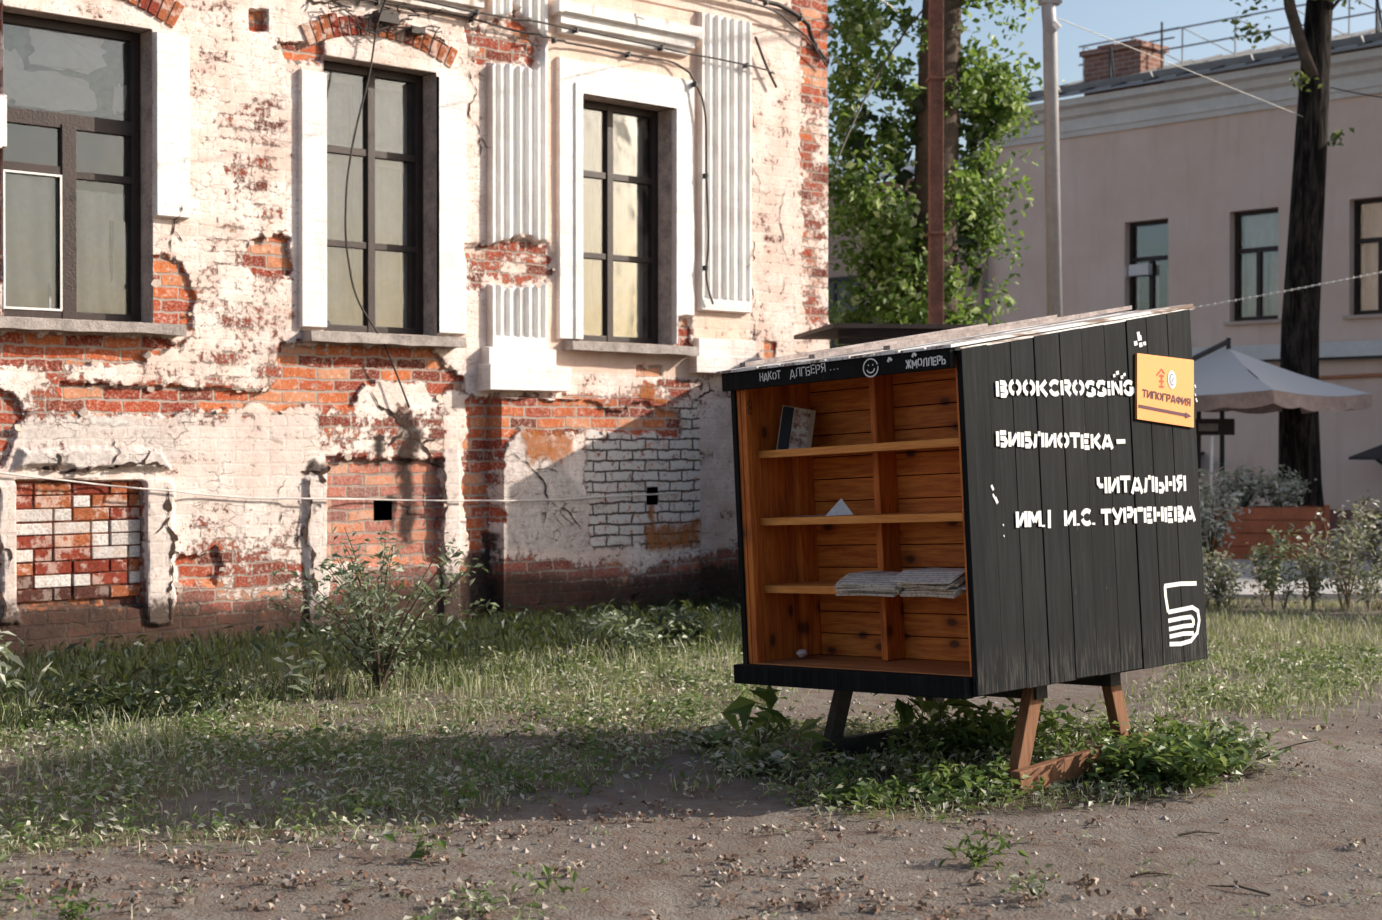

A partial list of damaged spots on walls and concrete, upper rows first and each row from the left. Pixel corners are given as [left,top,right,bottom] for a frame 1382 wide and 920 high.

spalling [248,9,266,32]
flaking render [275,33,326,64]
flaking render [791,0,834,330]
flaking render [245,227,292,276]
flaking render [464,232,556,292]
flaking render [0,253,687,568]
water stain [376,435,385,465]
crack [0,537,13,617]
flaking render [15,480,144,608]
crack [27,439,181,620]
flaking render [173,547,225,593]
crack [269,465,331,600]